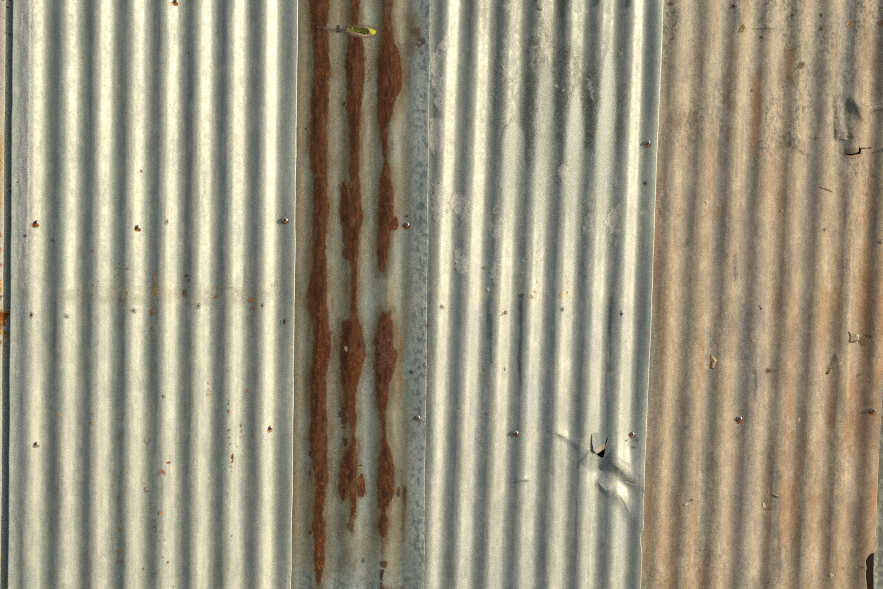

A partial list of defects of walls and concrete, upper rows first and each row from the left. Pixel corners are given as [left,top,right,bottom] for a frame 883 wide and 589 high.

leakage [499,46,623,246]
rust [0,310,10,347]
rust [304,0,410,589]